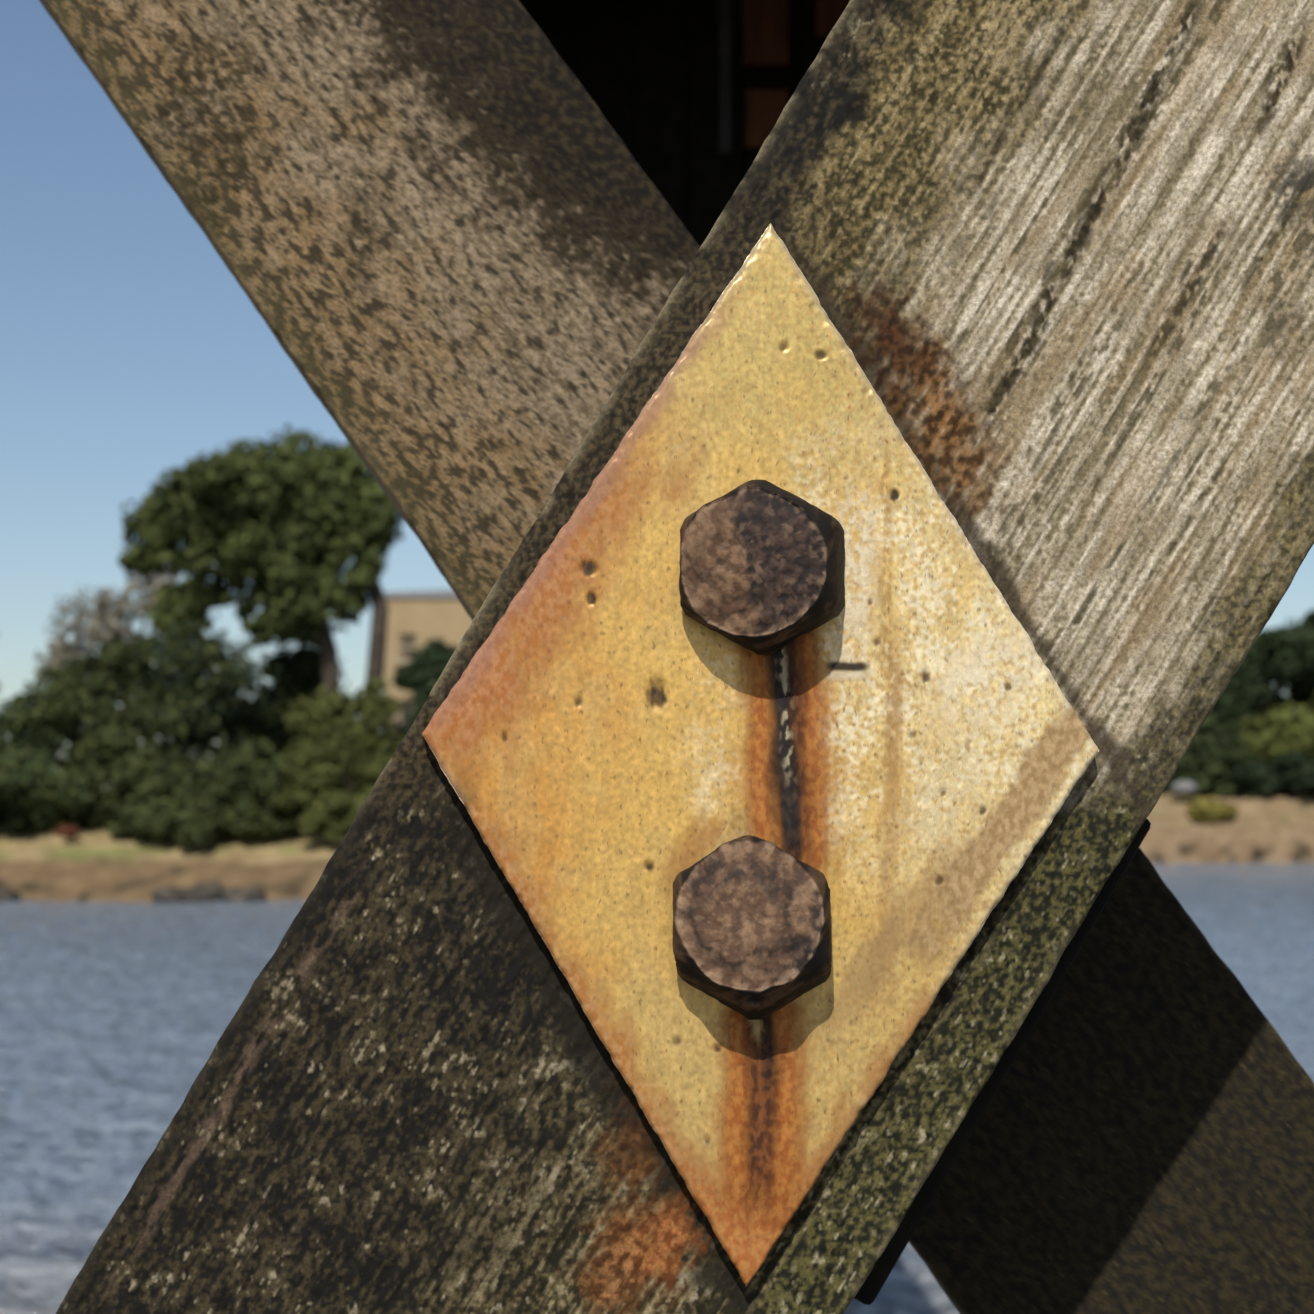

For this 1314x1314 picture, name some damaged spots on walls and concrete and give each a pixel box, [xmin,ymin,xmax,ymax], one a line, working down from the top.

corrosion [849,281,994,514]
corrosion [422,480,629,752]
corrosion [746,631,824,870]
corrosion [464,800,929,1314]